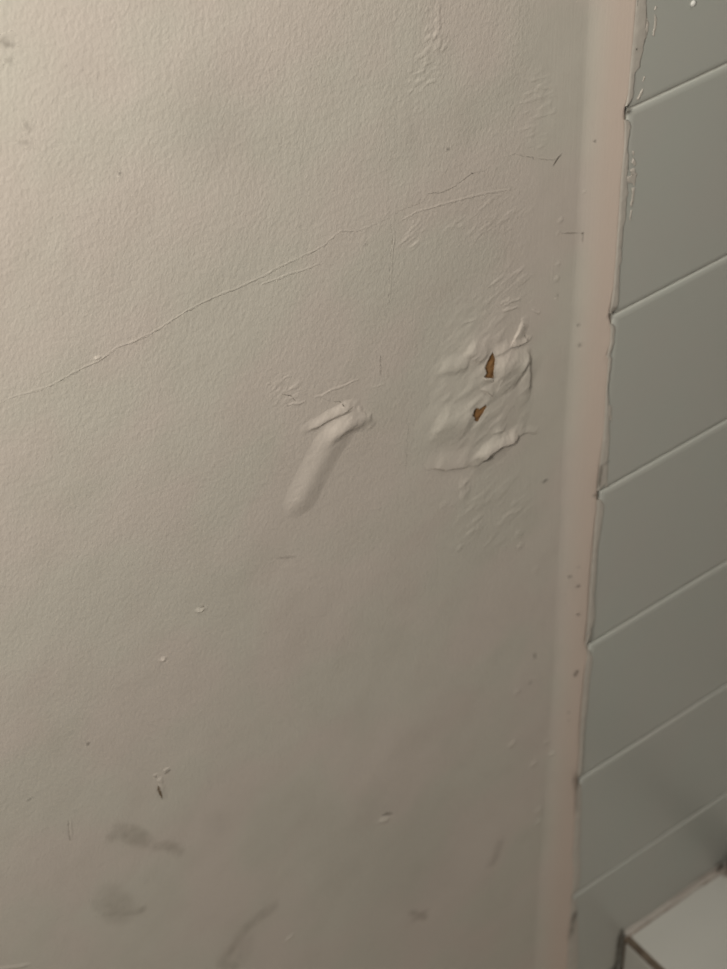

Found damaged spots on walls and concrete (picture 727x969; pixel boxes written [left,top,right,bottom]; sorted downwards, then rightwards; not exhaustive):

crack [0,152,560,403]
peeling [413,284,543,476]